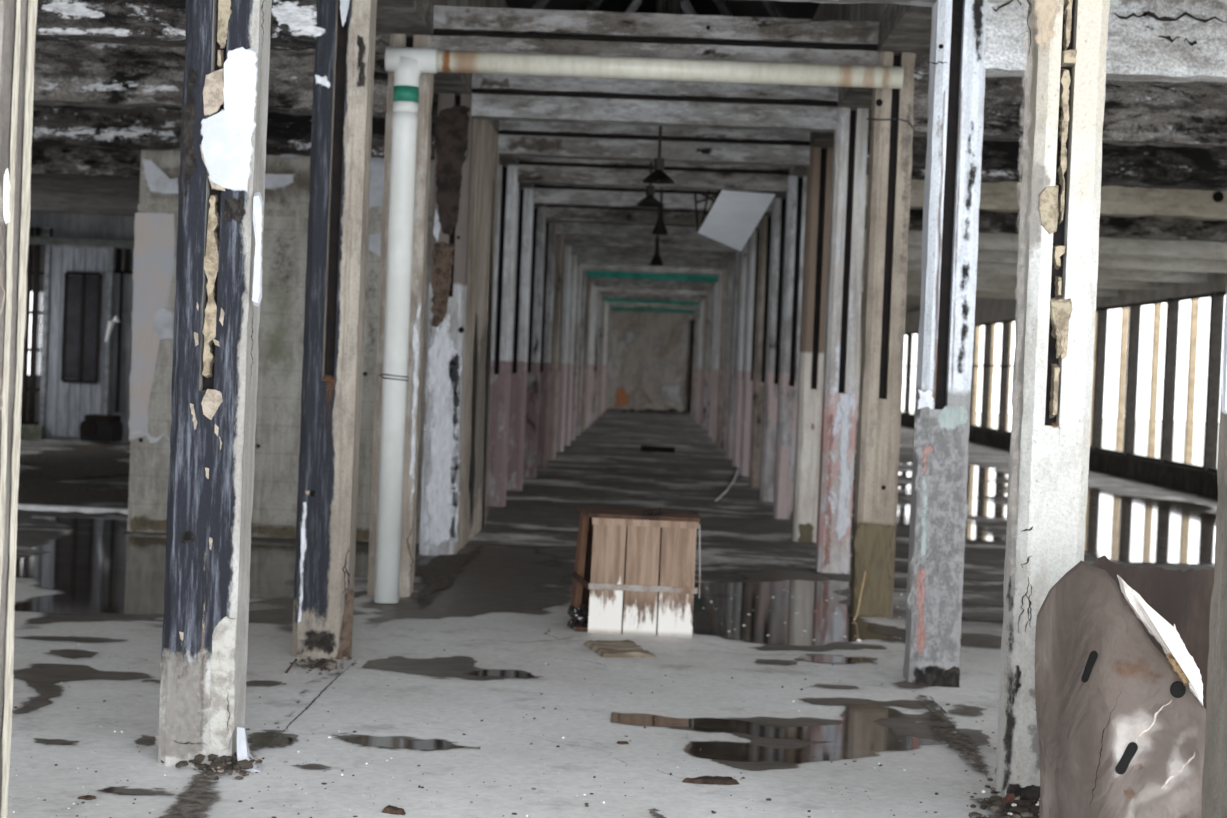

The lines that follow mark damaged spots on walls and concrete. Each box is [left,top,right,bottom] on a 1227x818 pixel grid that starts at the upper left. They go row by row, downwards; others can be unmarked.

crack [1114,11,1227,49]
flaking render [200,0,295,307]
damp [265,167,310,203]
peeling [190,389,223,450]
crack [1018,526,1033,633]